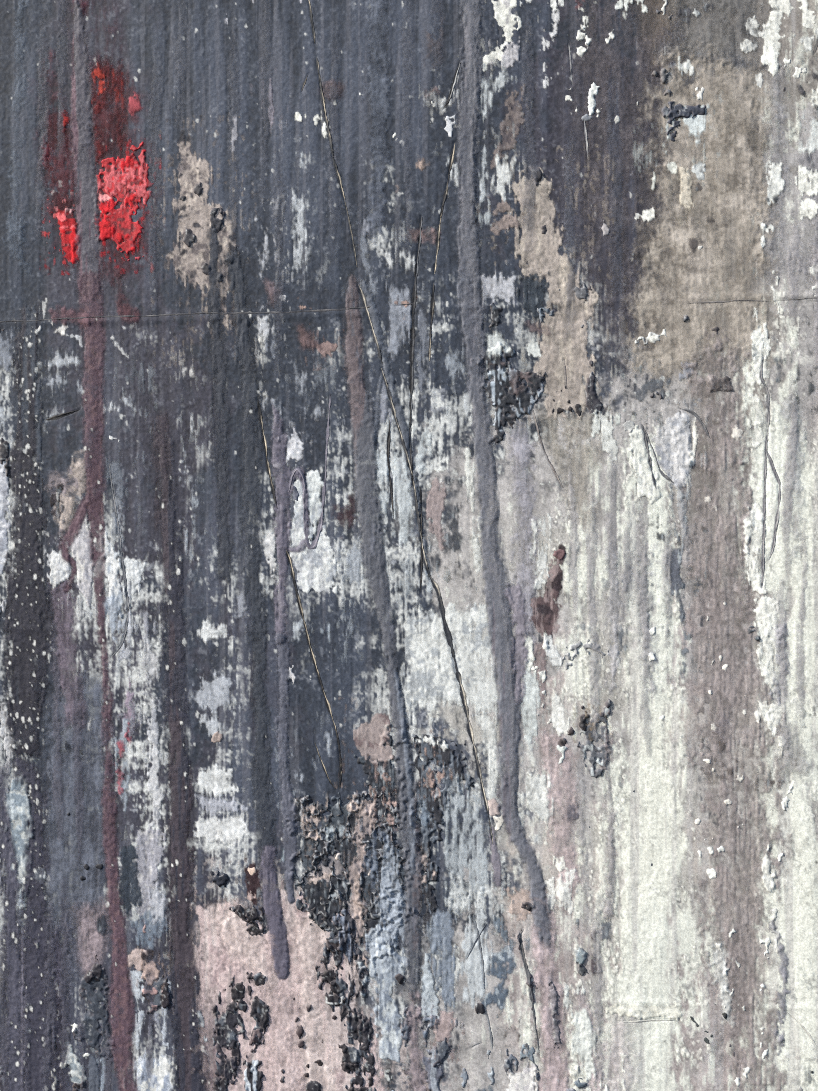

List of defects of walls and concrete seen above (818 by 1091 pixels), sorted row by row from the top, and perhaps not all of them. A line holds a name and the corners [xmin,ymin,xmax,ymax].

crack [0,306,371,323]
peeling [255,218,306,364]
peeling [360,219,432,398]
peeling [479,0,713,675]
peeling [628,0,818,448]
peeling [273,427,304,469]
peeling [290,470,363,594]
peeling [375,379,431,545]
leakage [782,398,805,537]
leakage [680,334,791,1091]
peeling [189,559,540,1091]
peeling [548,921,627,1091]